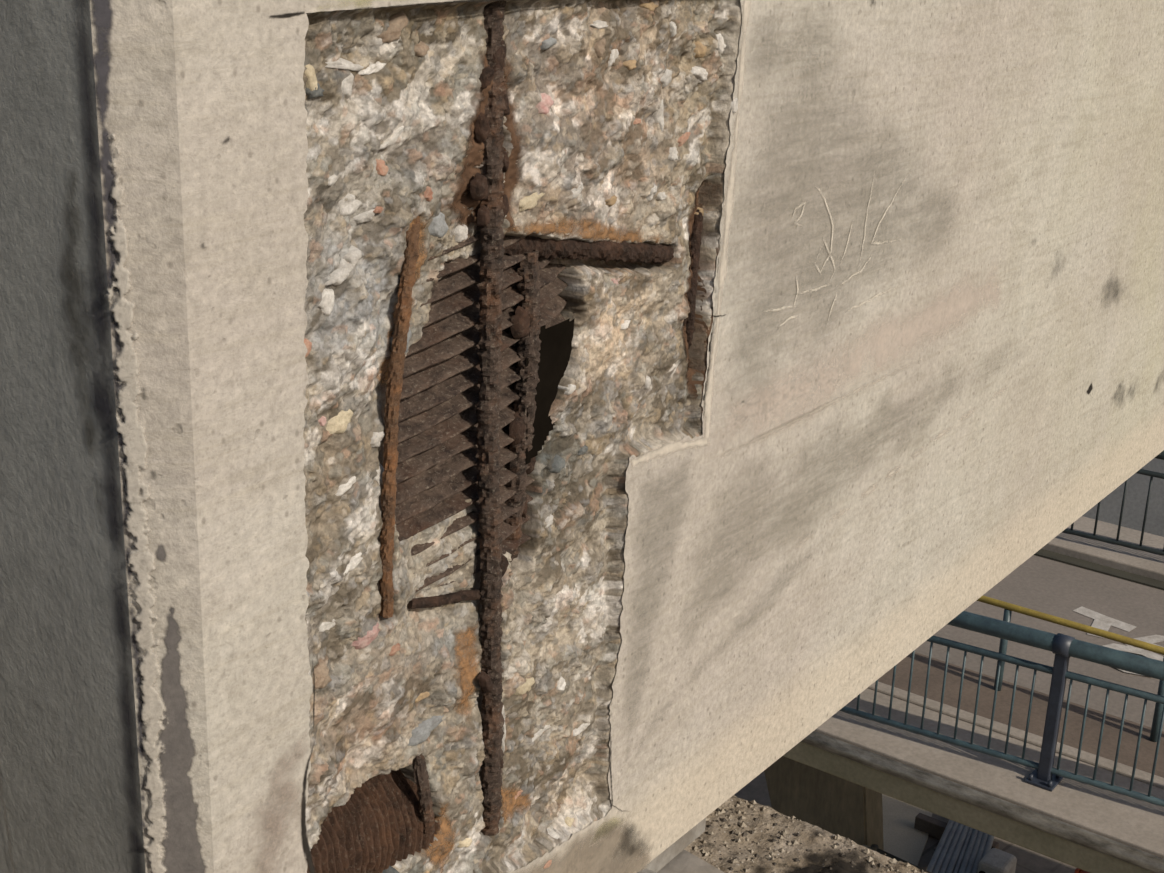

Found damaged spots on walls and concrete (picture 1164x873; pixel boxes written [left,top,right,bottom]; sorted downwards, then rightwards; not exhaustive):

corrosion [448,55,659,243]
corrosion [377,288,399,384]
corrosion [683,182,714,412]
leakage [64,0,145,873]
spalling [303,0,742,873]
spalling [156,545,166,561]
corrosion [456,628,478,714]
corrosion [426,806,455,867]
corrosion [501,789,531,822]